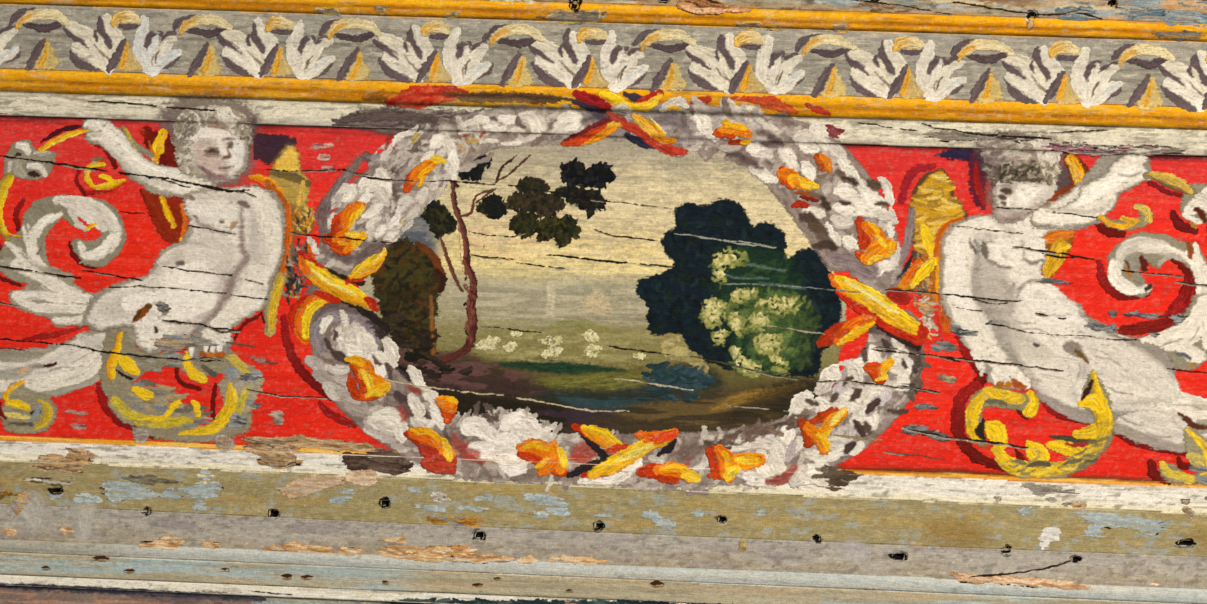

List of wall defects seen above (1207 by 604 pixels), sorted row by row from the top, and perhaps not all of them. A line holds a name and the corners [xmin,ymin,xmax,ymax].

peeling [859,2,922,13]
crack [0,155,777,269]
crack [952,206,1097,260]
crack [1121,270,1207,287]
peeling [239,356,278,383]
peeling [214,403,383,504]
peeling [2,448,224,536]
peeling [262,487,609,565]
peeling [641,509,677,530]
peeling [136,534,188,550]
crack [969,560,1071,578]
peeling [950,571,1096,590]